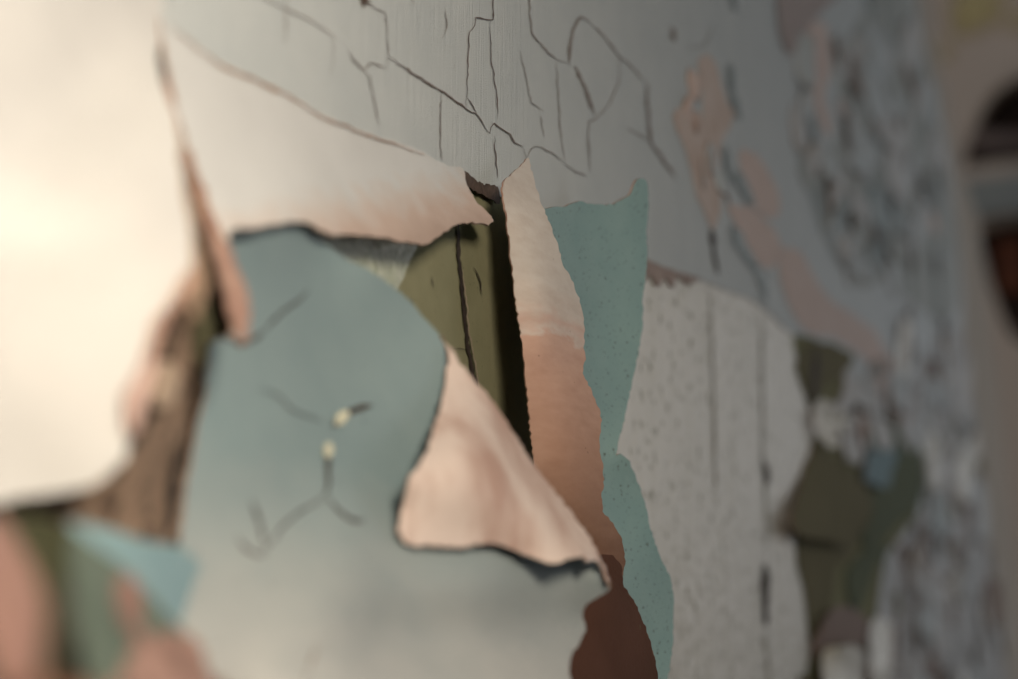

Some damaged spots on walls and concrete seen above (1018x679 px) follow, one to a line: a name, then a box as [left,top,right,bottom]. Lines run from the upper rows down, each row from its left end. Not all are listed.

crack [236,390,373,556]
peeling [0,0,674,679]
crack [167,0,676,178]
peeling [790,0,1005,679]